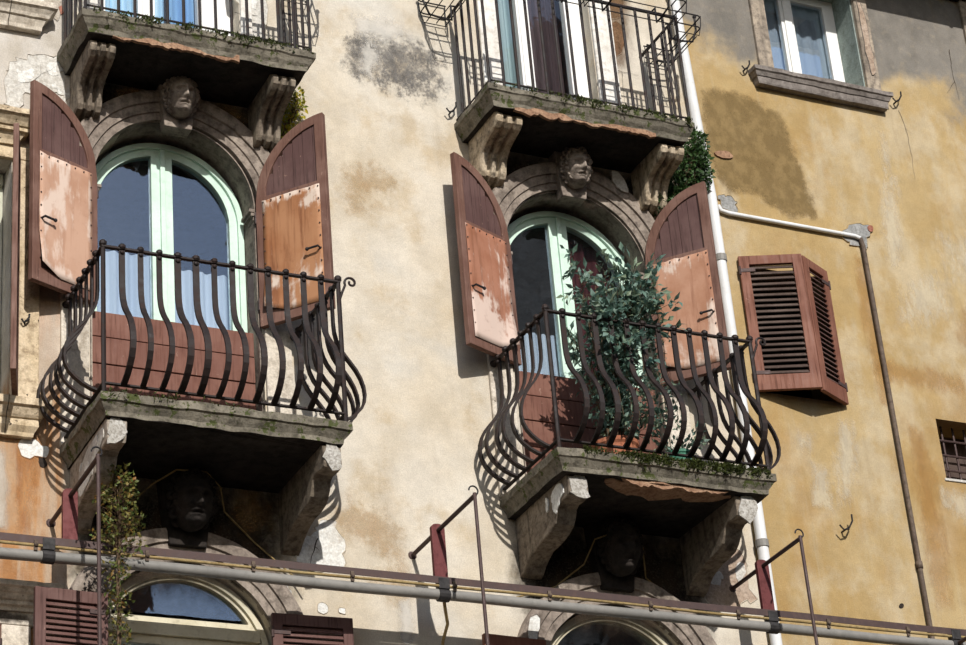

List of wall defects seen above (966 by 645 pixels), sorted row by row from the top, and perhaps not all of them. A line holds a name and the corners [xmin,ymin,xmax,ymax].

damp [609,0,626,64]
flaking render [3,54,70,108]
damp [703,90,816,217]
peeling [17,438,50,459]
peeling [545,475,590,514]
spalling [604,478,758,524]
flaking render [295,519,347,573]